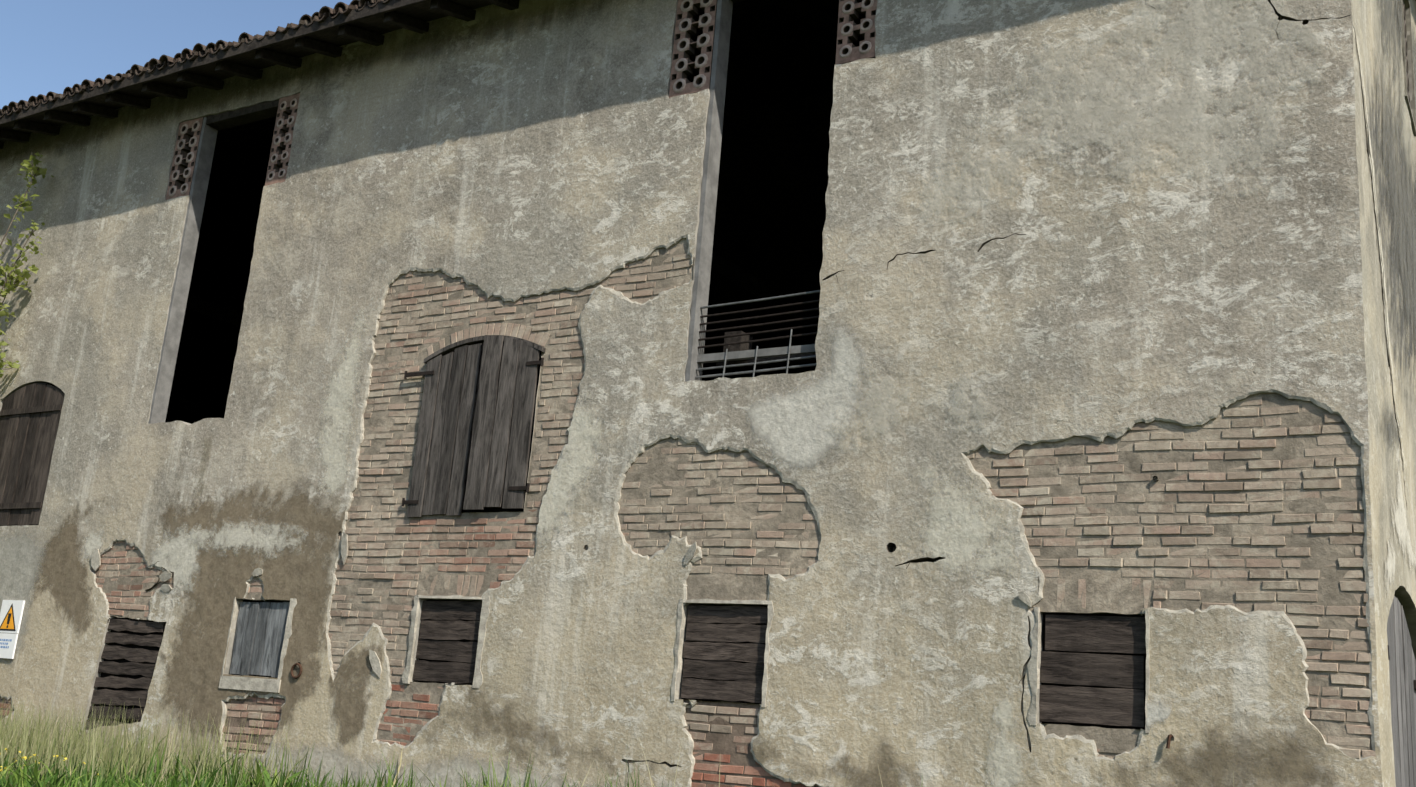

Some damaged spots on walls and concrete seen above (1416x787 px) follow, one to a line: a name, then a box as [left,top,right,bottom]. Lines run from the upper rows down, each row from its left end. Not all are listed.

water stain [33,508,104,631]
spalling [90,539,174,623]
spalling [219,693,286,757]
water stain [151,310,382,744]
spalling [326,234,695,748]
spalling [614,434,821,606]
spalling [622,700,829,787]
spalling [961,40,1416,761]
crack [1268,0,1407,504]
water stain [1368,0,1416,376]